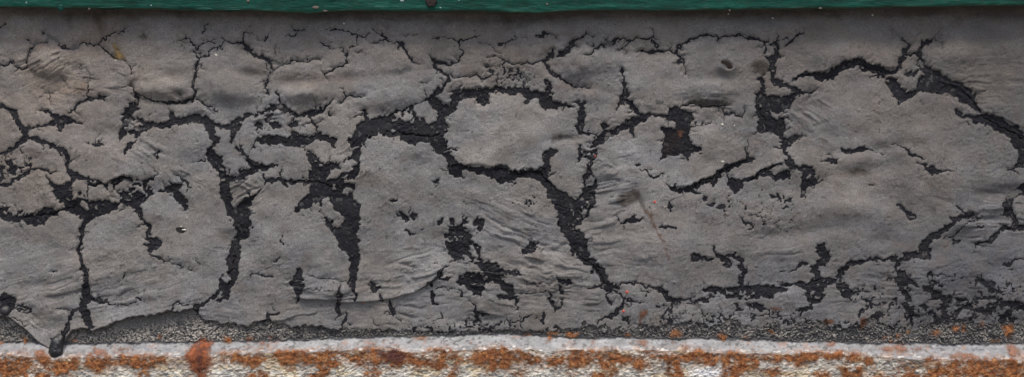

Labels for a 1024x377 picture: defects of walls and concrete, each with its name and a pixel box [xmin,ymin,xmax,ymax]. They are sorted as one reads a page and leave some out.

crack [0,28,134,75]
peeling [249,122,337,148]
crack [118,24,1024,332]
peeling [653,106,702,161]
peeling [821,146,885,164]
crack [0,81,192,335]
peeling [390,197,424,236]
peeling [702,189,794,230]
spalling [66,206,1024,344]
spalling [0,293,37,342]
corrosion [0,339,167,377]
corrosion [185,324,1024,377]